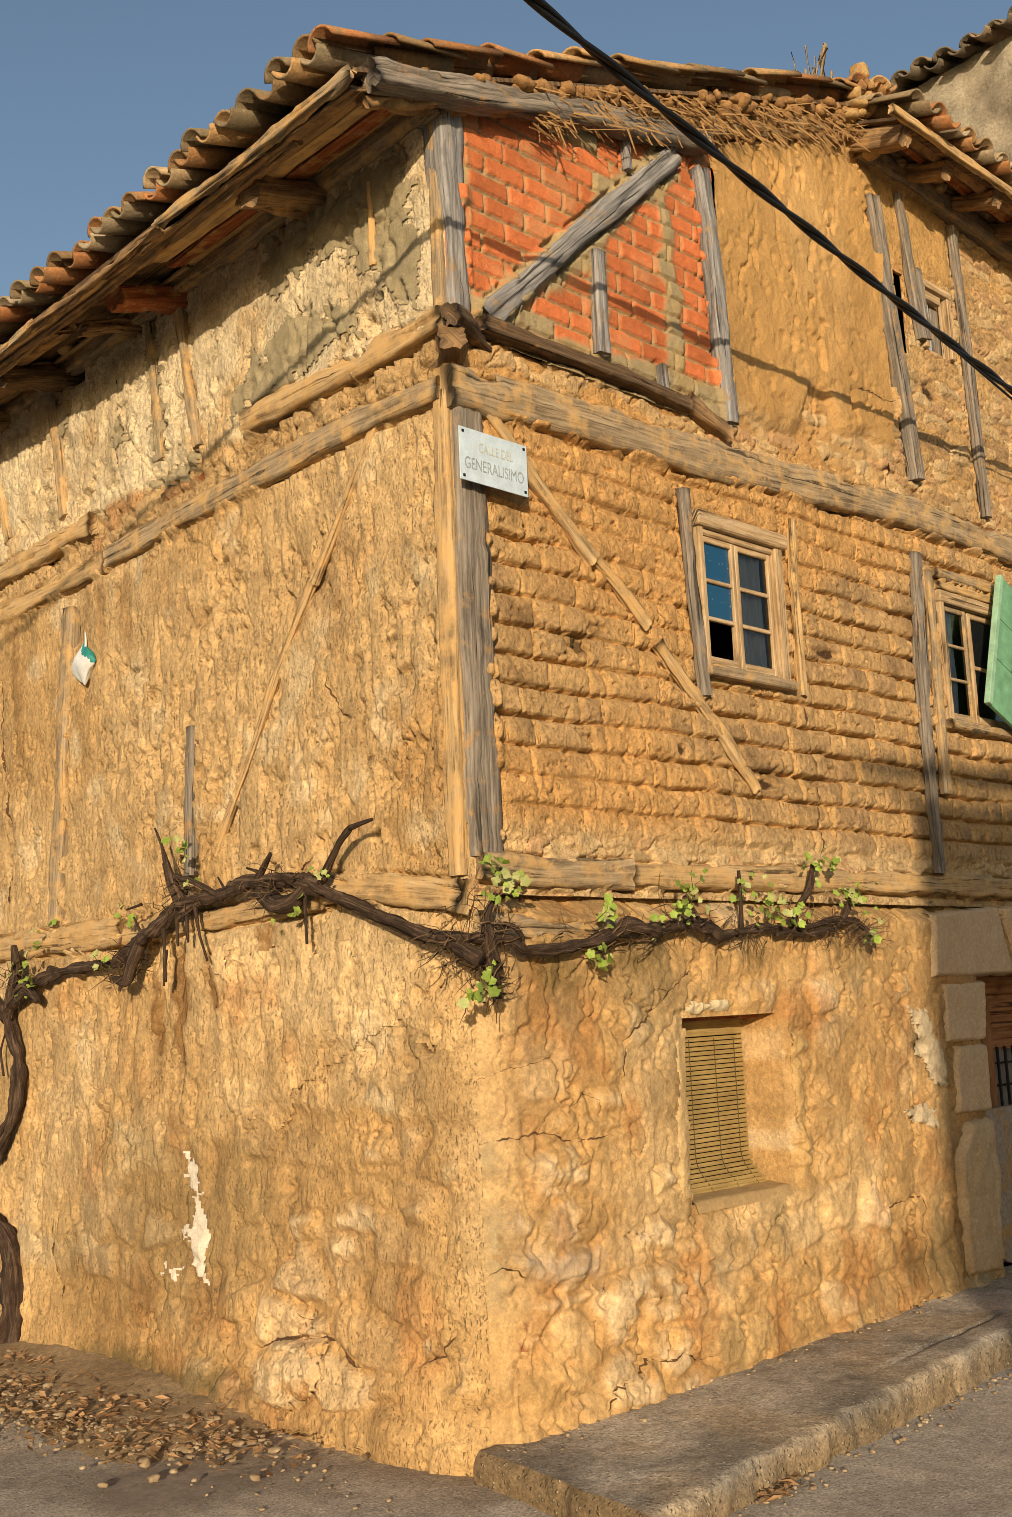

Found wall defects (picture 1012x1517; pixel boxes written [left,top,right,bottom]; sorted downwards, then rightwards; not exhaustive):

crack [479,970,690,1145]
peeling [160,1151,211,1286]
crack [261,1313,362,1368]
crack [609,1353,717,1411]